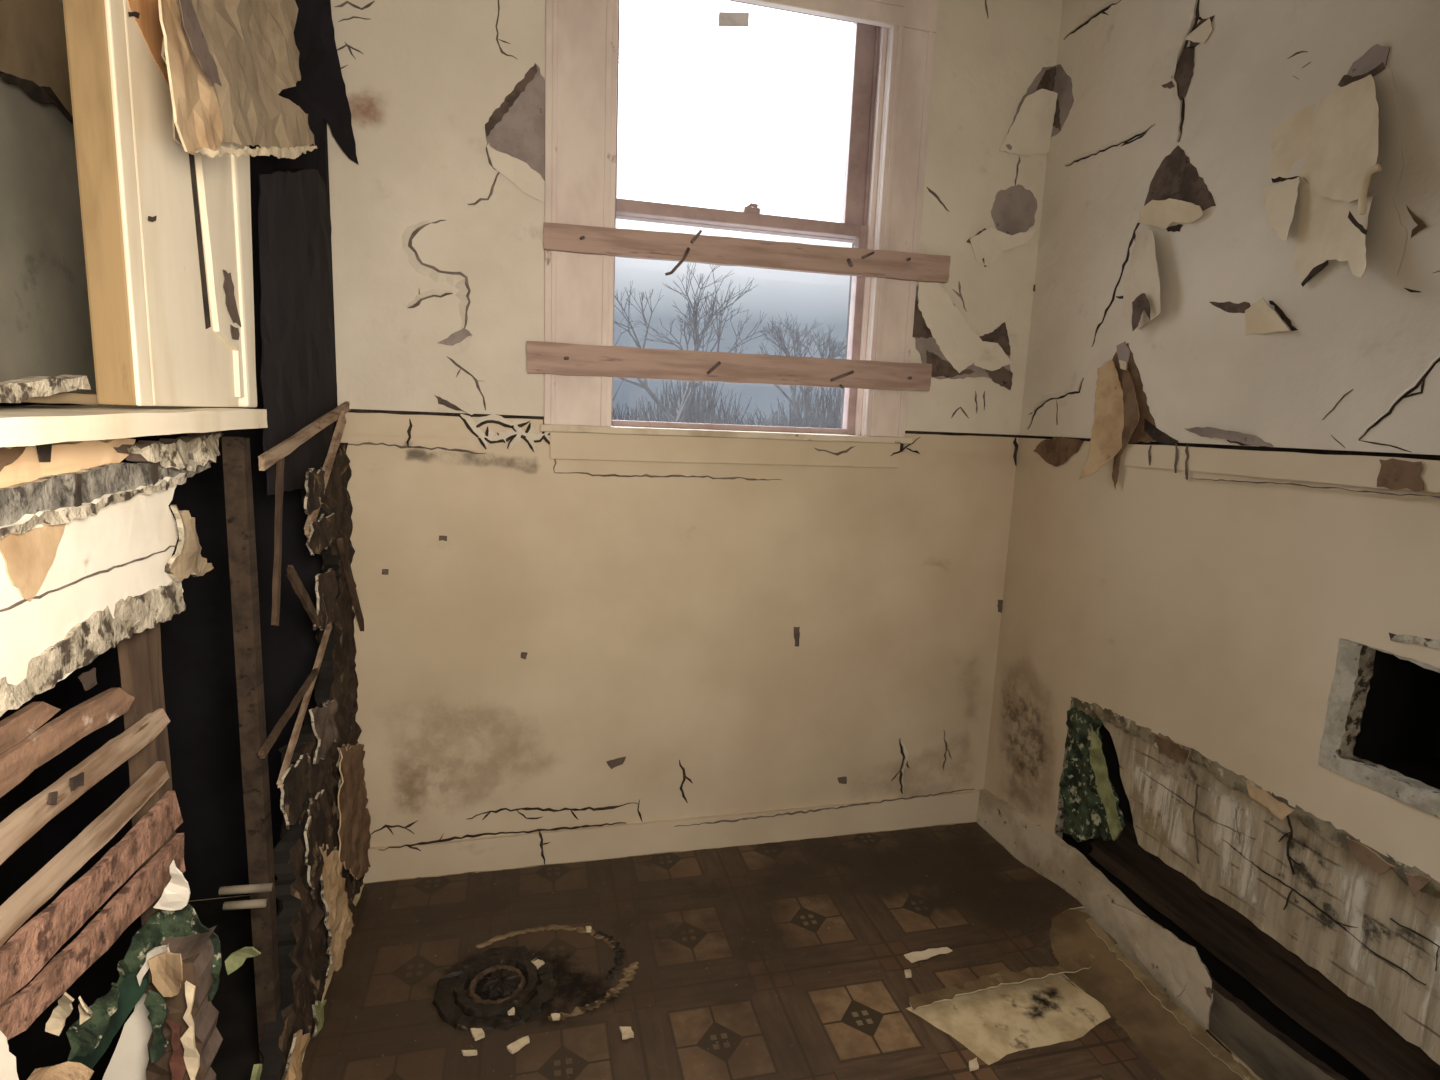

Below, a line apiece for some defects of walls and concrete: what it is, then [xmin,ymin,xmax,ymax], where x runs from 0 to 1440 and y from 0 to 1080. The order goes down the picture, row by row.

peeling [485,63,545,203]
crack [1063,0,1215,166]
spalling [1139,146,1216,232]
peeling [1263,42,1427,287]
crack [402,143,505,410]
spalling [0,432,223,601]
peeling [1034,341,1274,490]
crack [1192,478,1440,498]
crack [1322,354,1440,452]
crack [370,731,974,865]
spalling [1059,697,1440,1065]
crack [1140,770,1440,985]